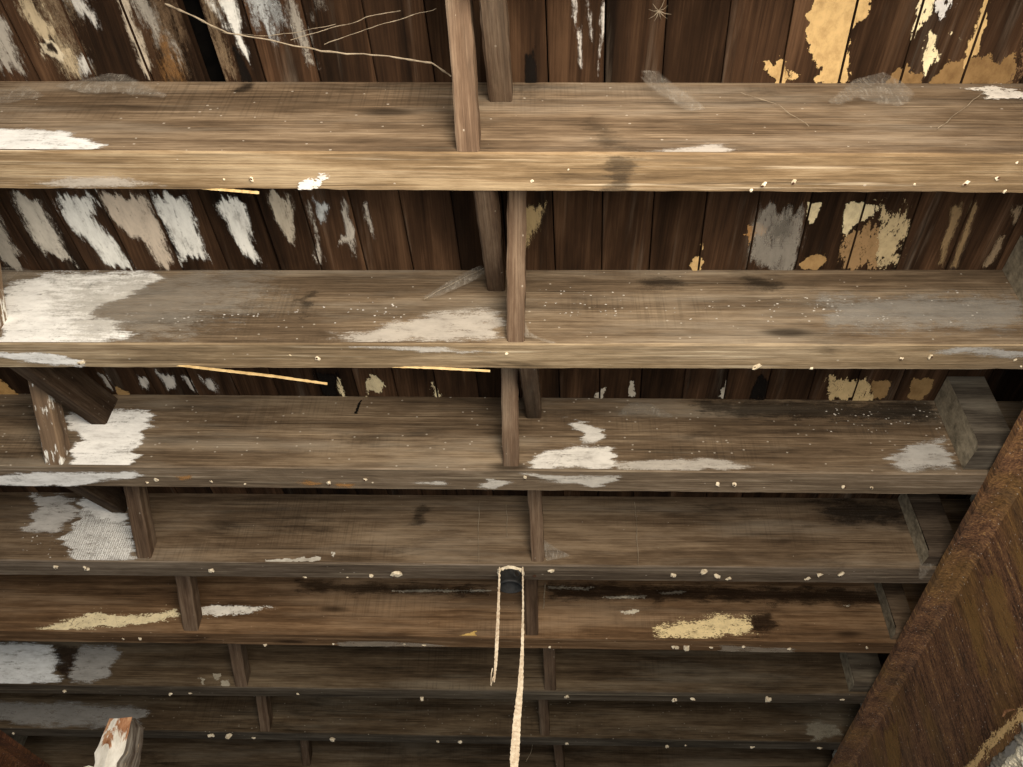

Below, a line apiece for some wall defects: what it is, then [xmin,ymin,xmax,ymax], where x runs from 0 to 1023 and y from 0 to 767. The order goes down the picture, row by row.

peeling [929,52,1017,84]